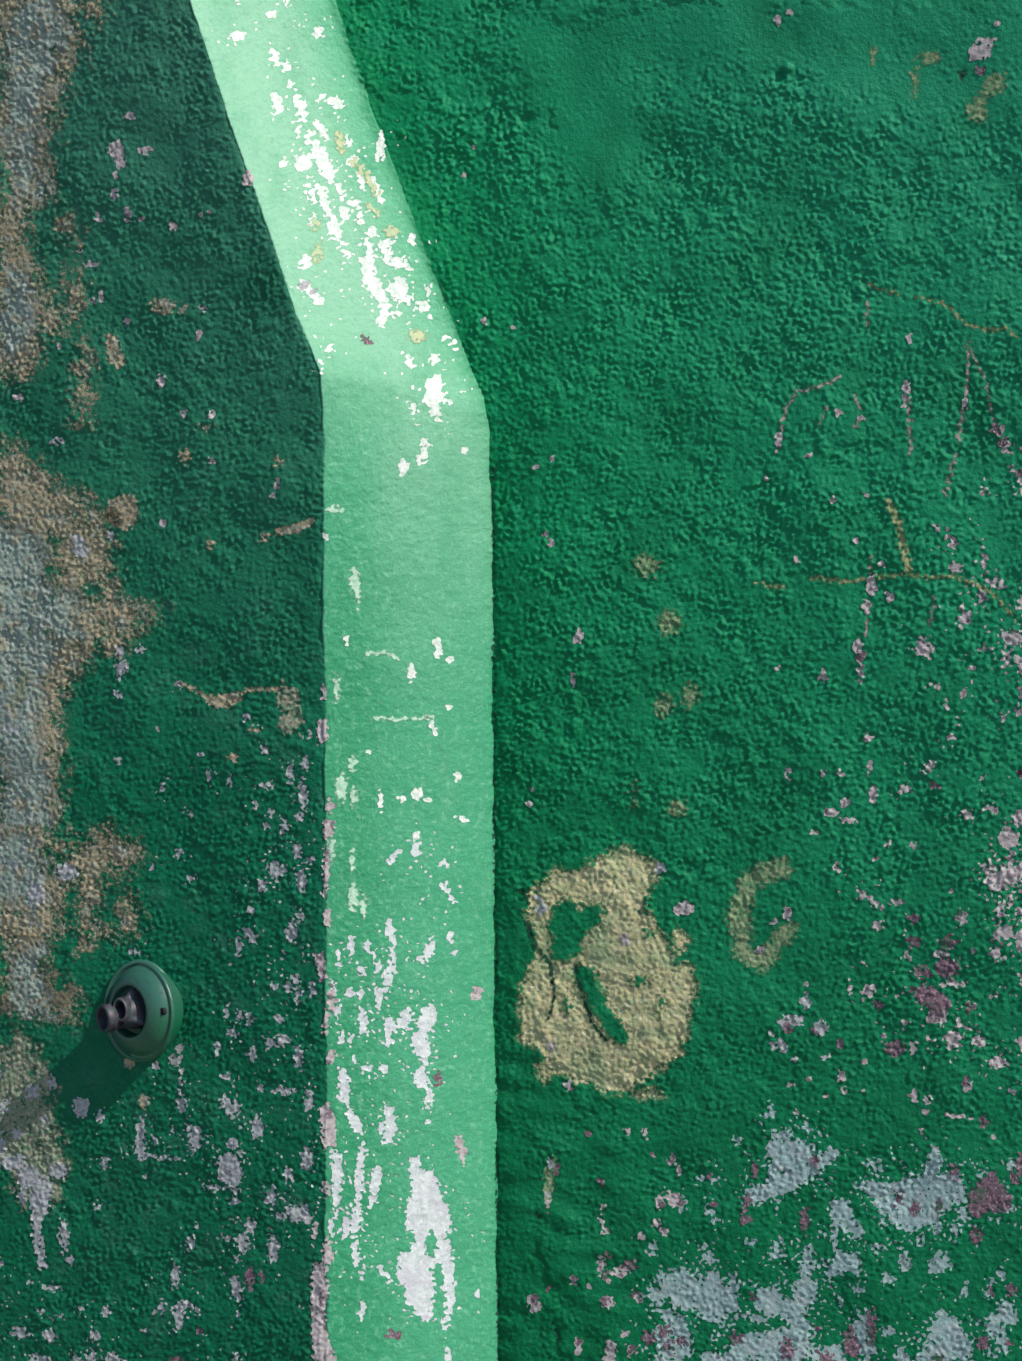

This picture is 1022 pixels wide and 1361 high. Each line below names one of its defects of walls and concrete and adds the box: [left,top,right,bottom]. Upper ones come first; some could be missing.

peeling [1007,444,1022,497]
peeling [0,0,485,1361]
peeling [573,627,584,644]
peeling [866,518,1022,804]
peeling [824,797,859,824]
peeling [832,774,1022,1095]
peeling [542,1154,561,1214]
peeling [569,981,1022,1361]
peeling [526,1286,552,1313]